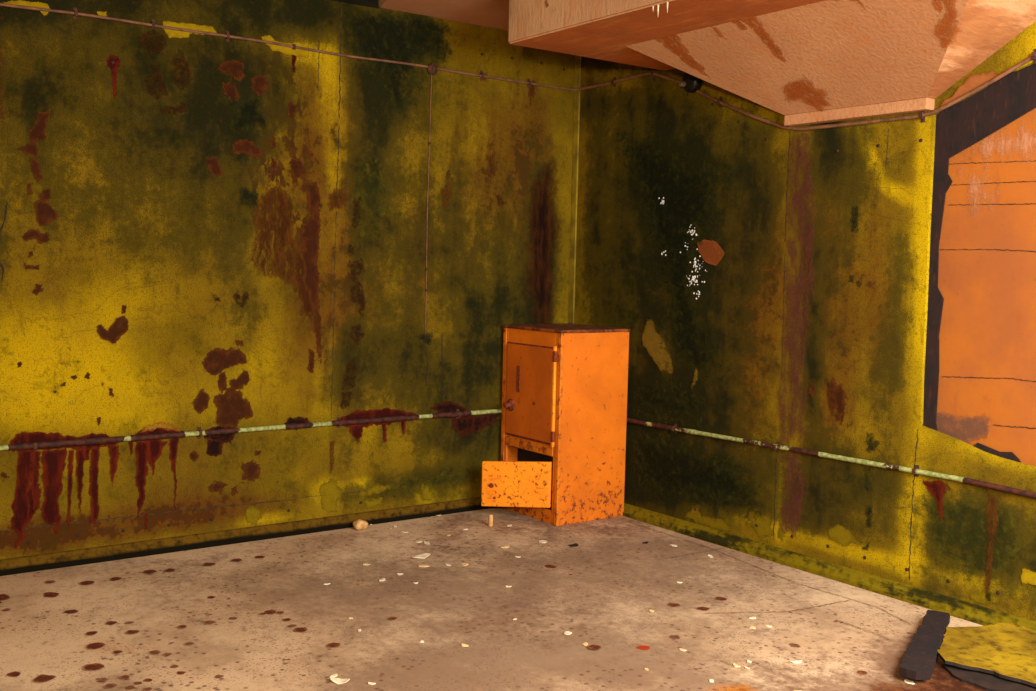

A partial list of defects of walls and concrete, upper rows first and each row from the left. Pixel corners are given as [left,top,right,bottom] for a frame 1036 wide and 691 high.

peeling [163,21,217,38]
mould [341,8,452,121]
rust [252,182,345,373]
leakage [616,133,766,520]
leakage [778,131,818,536]
leakage [850,206,859,232]
spalling [923,64,1036,466]
rust [10,422,183,548]
rust [204,425,235,457]
rust [339,408,416,442]
rust [431,401,500,440]
leakage [866,433,880,451]